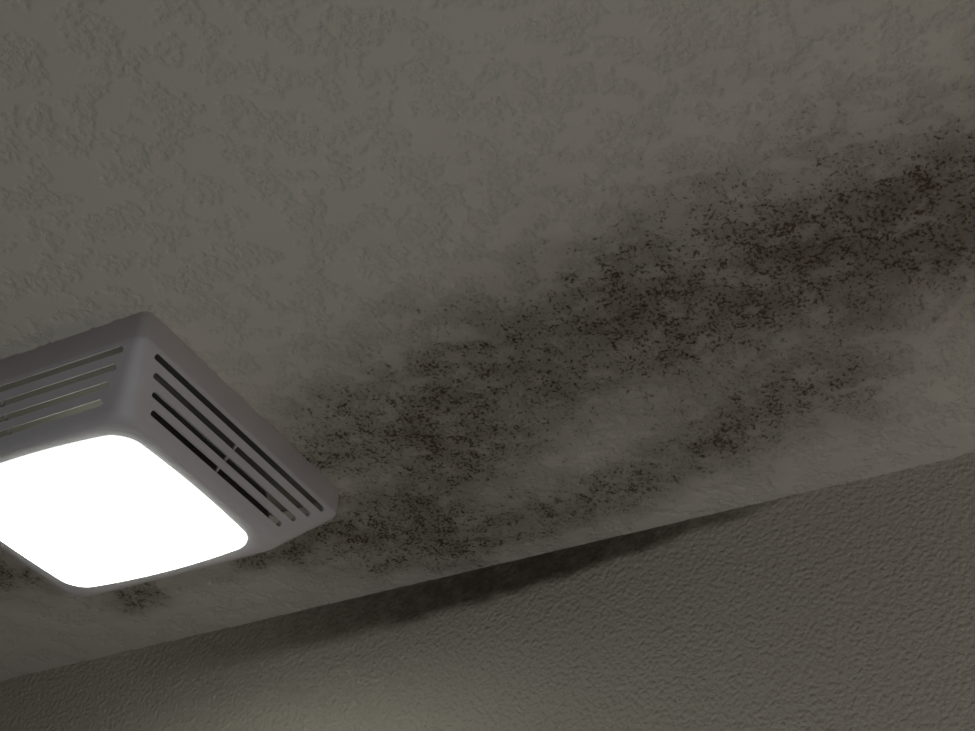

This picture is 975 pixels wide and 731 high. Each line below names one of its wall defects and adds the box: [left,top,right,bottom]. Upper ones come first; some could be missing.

water stain [236,136,975,623]